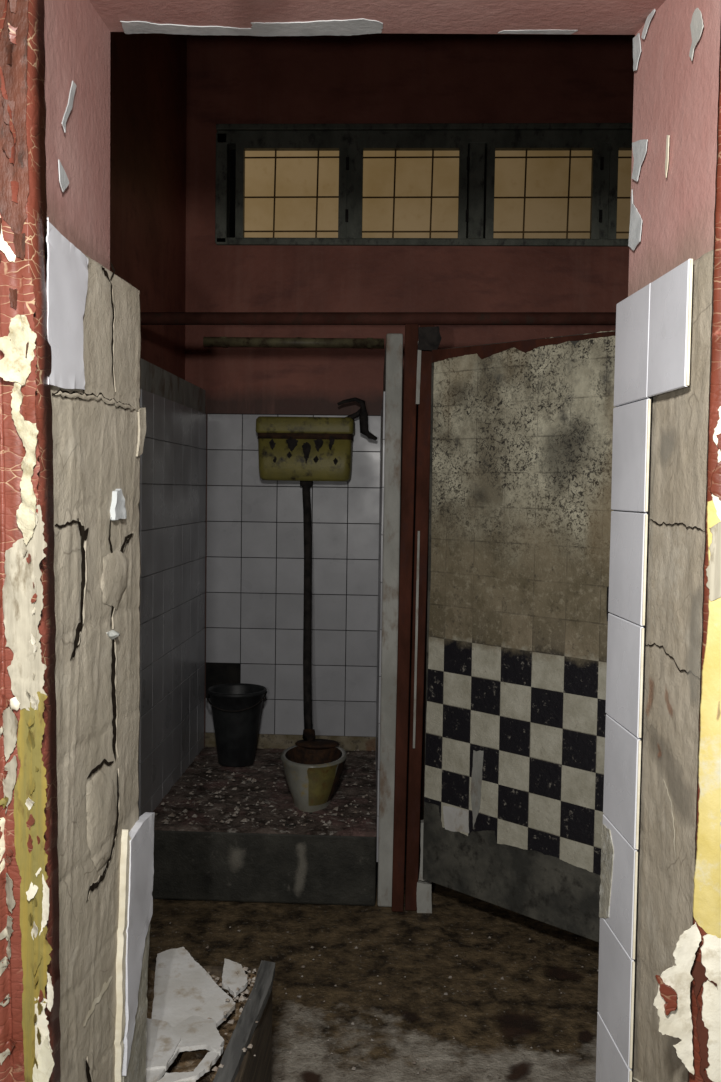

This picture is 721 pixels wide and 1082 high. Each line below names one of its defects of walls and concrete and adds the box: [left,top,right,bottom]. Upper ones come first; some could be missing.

peeling [120,18,383,36]
peeling [633,9,655,71]
peeling [628,139,648,251]
spalling [0,0,146,1082]
crack [648,519,705,532]
crack [645,643,697,677]
spalling [629,250,721,1082]
crack [55,518,134,902]
spalling [145,947,248,1082]
damp [495,1012,539,1038]
damp [302,1071,320,1082]
damp [507,1062,531,1080]